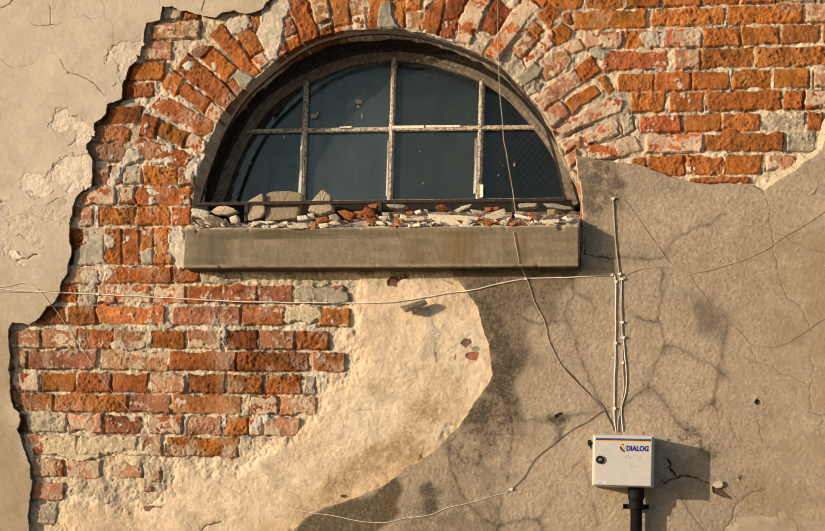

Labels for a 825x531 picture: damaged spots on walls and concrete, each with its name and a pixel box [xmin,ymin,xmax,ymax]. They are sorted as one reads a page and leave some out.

spalling [535,0,825,190]
flaking render [0,199,43,266]
spalling [9,7,492,531]
spalling [571,173,582,255]
leakage [454,270,579,464]
leakage [297,478,400,531]
crack [662,458,708,487]
spalling [726,510,797,531]